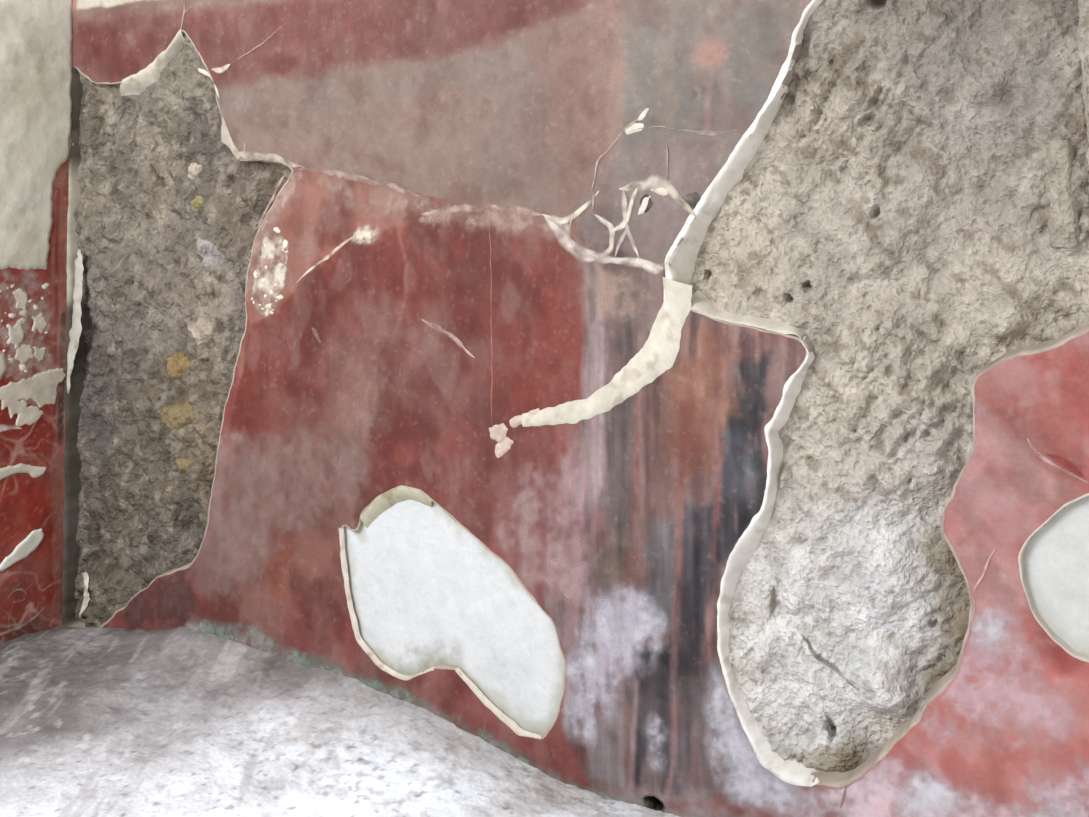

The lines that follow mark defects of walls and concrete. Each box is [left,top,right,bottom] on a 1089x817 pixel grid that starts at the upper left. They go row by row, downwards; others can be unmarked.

spalling [0,29,430,628]
crack [489,108,737,458]
spalling [421,0,1089,788]
flaking render [339,485,566,740]
damp [566,591,663,739]
damp [709,687,1020,817]
damp [947,669,1052,725]
damp [1032,770,1089,817]